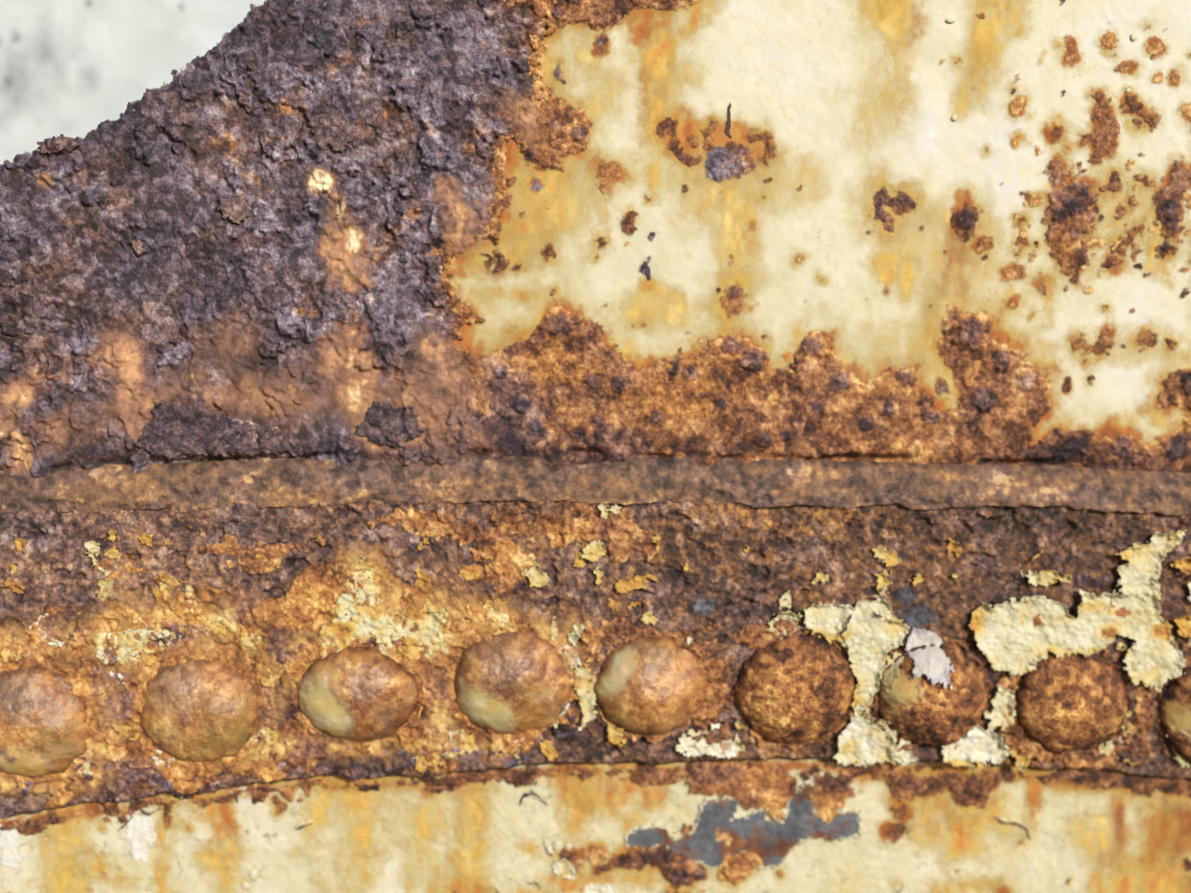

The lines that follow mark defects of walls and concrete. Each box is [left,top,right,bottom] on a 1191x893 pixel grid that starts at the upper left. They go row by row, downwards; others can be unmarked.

rust [0,0,1191,479]
peeling [2,538,27,594]
peeling [84,529,121,601]
peeling [138,532,169,547]
peeling [458,564,483,582]
rust [0,502,1191,893]
peeling [766,547,955,768]
peeling [941,530,1191,771]
peeling [624,778,866,870]